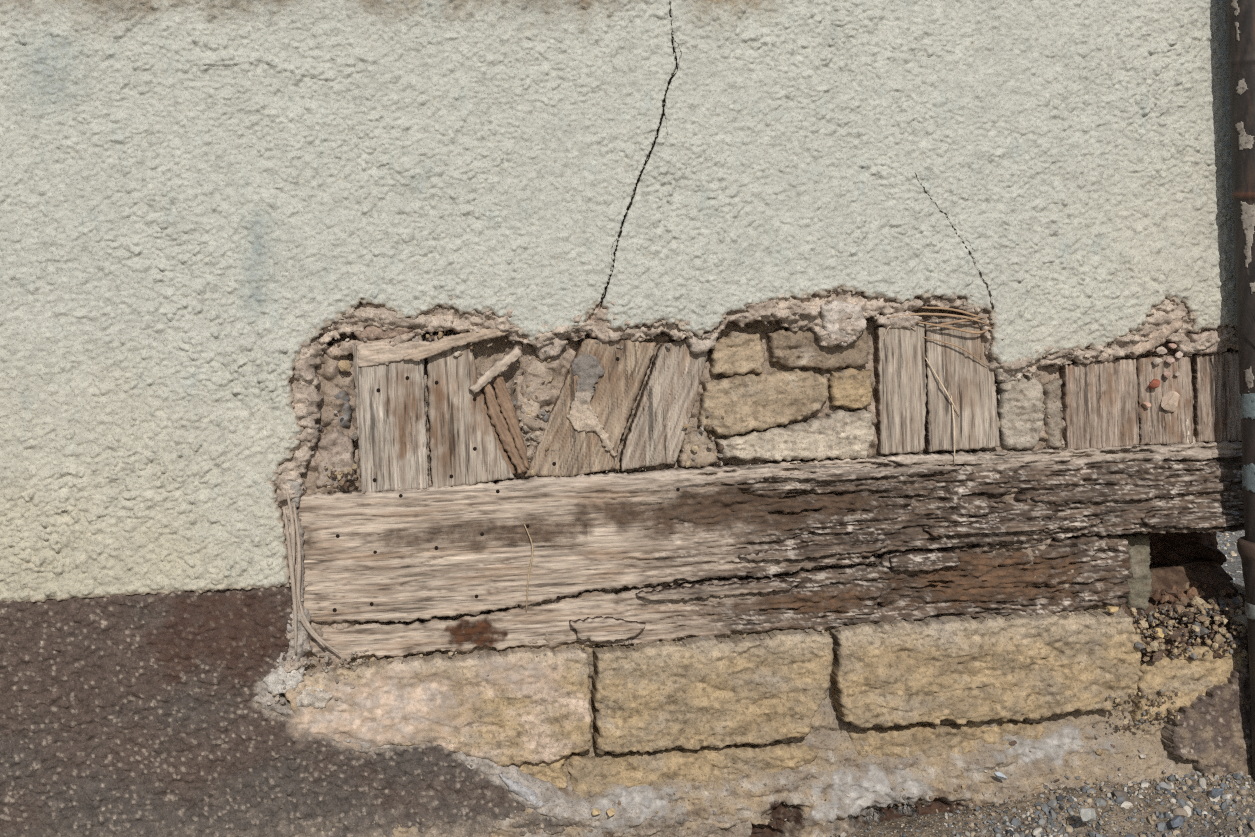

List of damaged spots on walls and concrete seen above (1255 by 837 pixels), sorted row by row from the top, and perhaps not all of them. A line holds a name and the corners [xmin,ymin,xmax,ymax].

crack [600,2,682,306]
spalling [254,283,1238,718]
spalling [455,751,652,821]
efflorescence [596,784,675,828]
efflorescence [811,766,930,822]